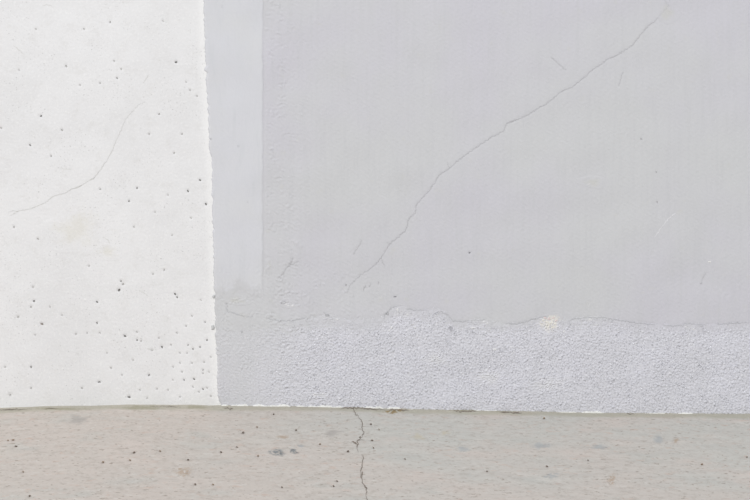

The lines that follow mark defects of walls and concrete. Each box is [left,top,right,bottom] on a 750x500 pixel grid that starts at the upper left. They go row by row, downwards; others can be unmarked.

crack [348,0,670,290]
peeling [221,404,343,415]
crack [344,407,406,500]